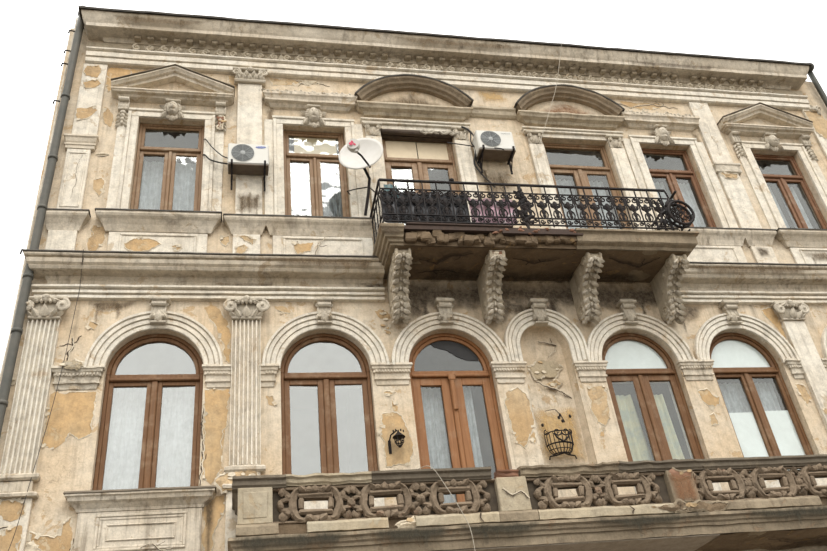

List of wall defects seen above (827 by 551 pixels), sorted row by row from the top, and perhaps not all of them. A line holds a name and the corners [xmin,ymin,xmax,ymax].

peeling [83,64,150,92]
peeling [75,106,115,127]
peeling [87,225,106,251]
peeling [124,236,161,252]
peeling [41,391,98,450]
peeling [377,390,414,468]
peeling [504,387,537,449]
crack [536,381,572,399]
peeling [587,384,611,437]
peeling [200,388,259,551]
peeling [0,497,73,551]